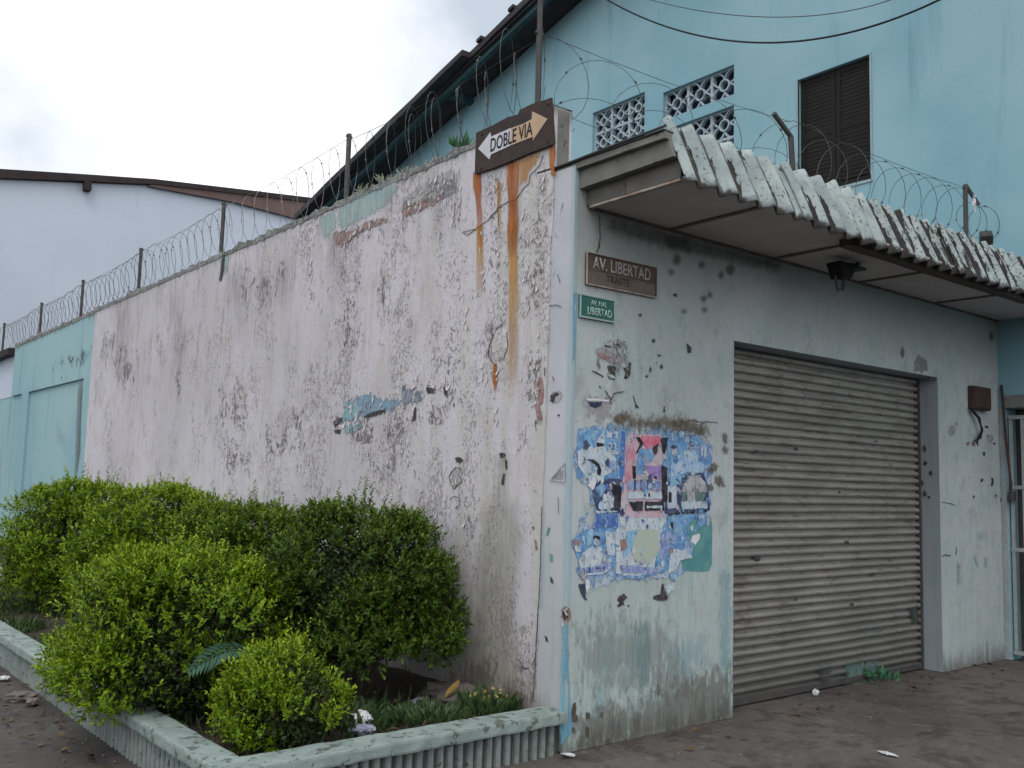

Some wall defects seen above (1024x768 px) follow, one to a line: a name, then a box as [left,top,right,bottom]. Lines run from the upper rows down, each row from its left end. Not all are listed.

rust [473,172,483,268]
rust [497,145,556,342]
peeling [303,169,563,501]
peeling [596,332,631,381]
peeling [682,518,712,572]
spalling [579,579,590,600]
spalling [653,584,668,601]